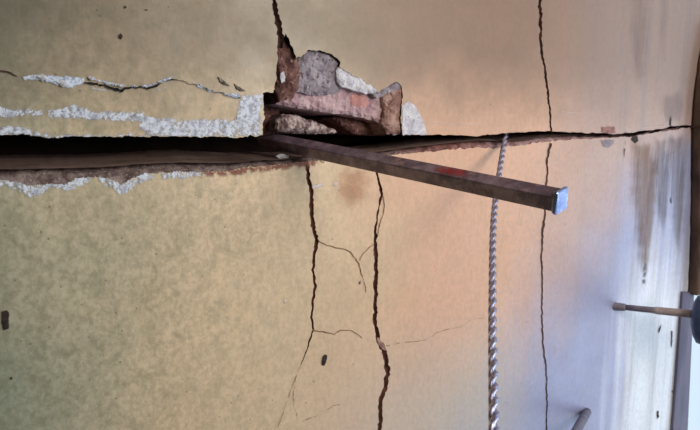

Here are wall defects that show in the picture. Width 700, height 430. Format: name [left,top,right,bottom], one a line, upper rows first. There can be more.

crack [272,0,284,48]
flaking render [0,39,427,138]
crack [348,0,700,186]
flaking render [0,177,90,197]
flaking render [99,173,153,194]
flaking render [162,171,201,179]
leakage [636,147,655,283]
crack [0,150,448,430]
crack [540,210,548,430]